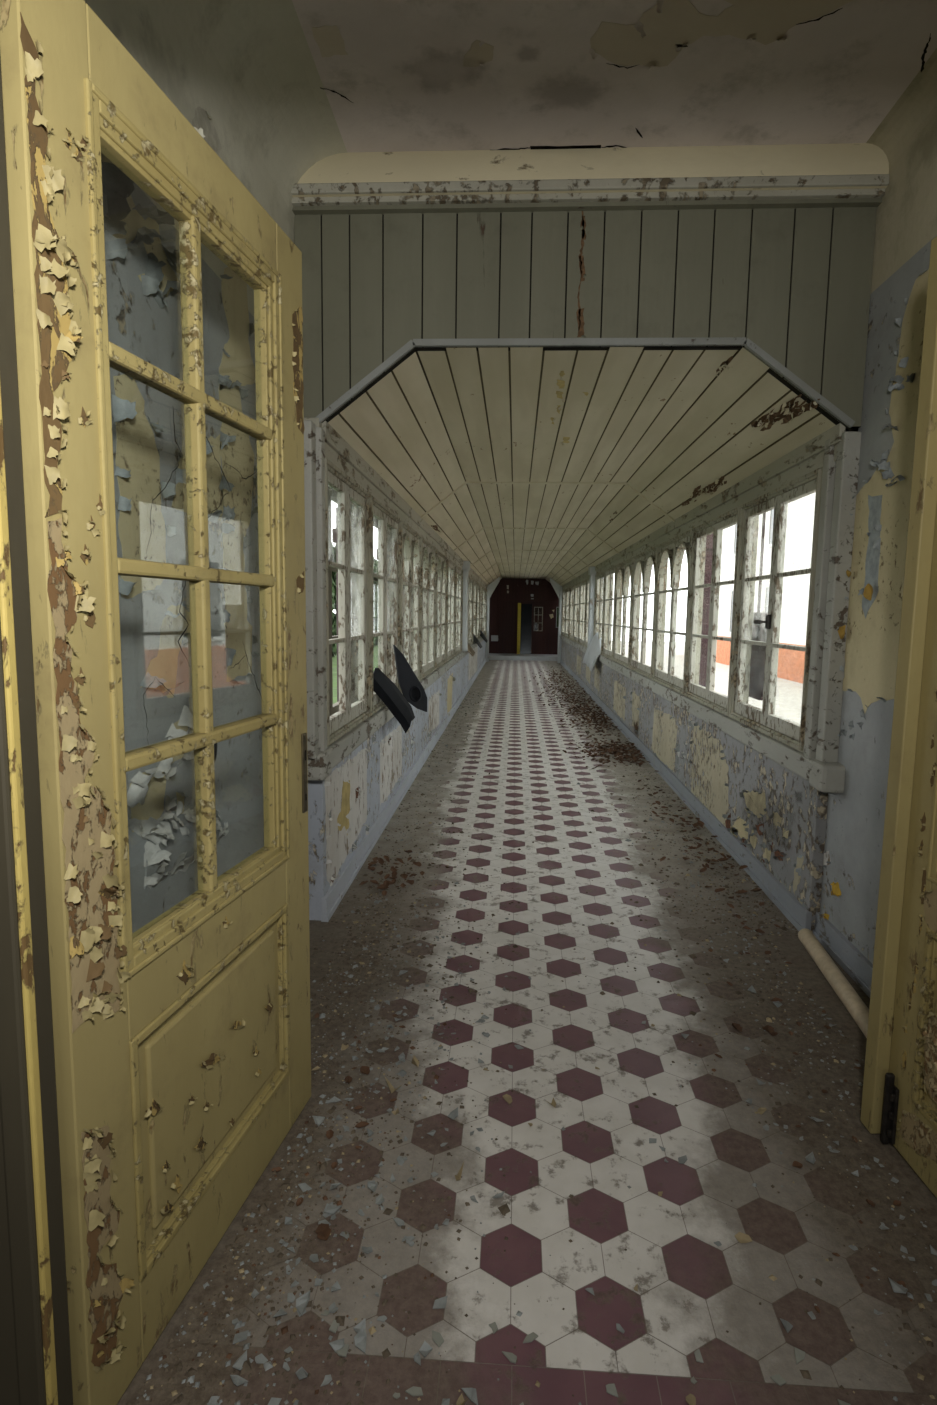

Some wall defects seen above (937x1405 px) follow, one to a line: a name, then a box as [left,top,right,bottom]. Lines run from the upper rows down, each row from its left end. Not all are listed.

peeling [20,12,194,1033]
peeling [206,267,260,685]
peeling [838,268,929,740]
peeling [324,645,478,886]
peeling [612,680,804,904]
peeling [81,1126,135,1373]